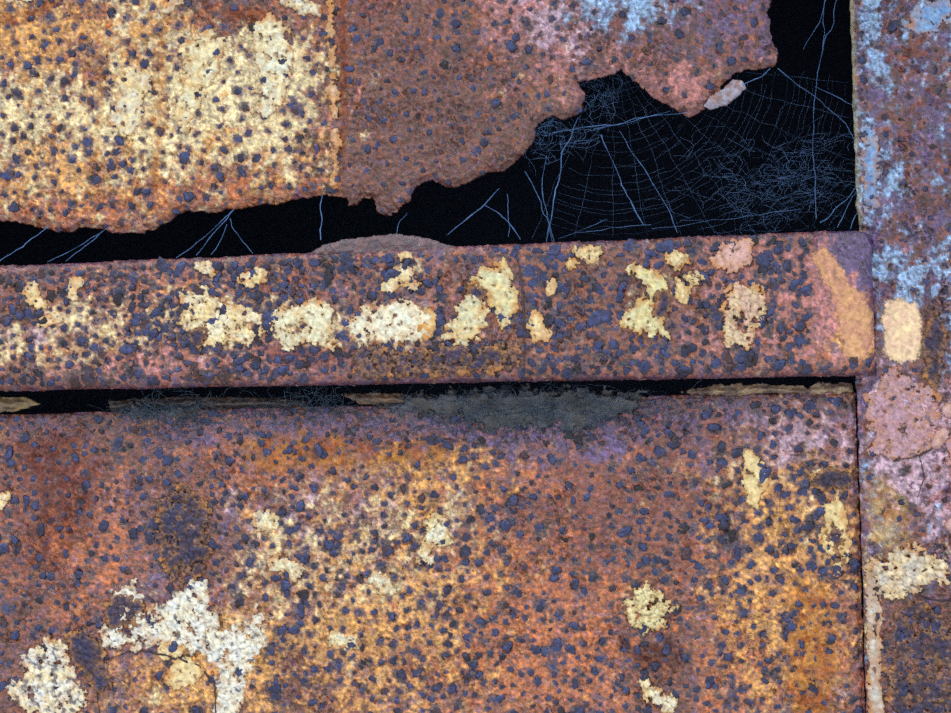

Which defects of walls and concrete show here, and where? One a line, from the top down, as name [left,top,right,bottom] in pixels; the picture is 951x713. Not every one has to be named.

corrosion [0,0,184,228]
peeling [108,67,152,138]
peeling [155,0,184,21]
corrosion [141,111,227,215]
peeling [171,29,232,134]
corrosion [217,101,329,205]
peeling [250,0,322,118]
corrosion [282,0,553,186]
corrosion [704,33,748,110]
corrosion [0,234,830,388]
corrosion [0,393,864,713]
corrosion [871,589,951,713]